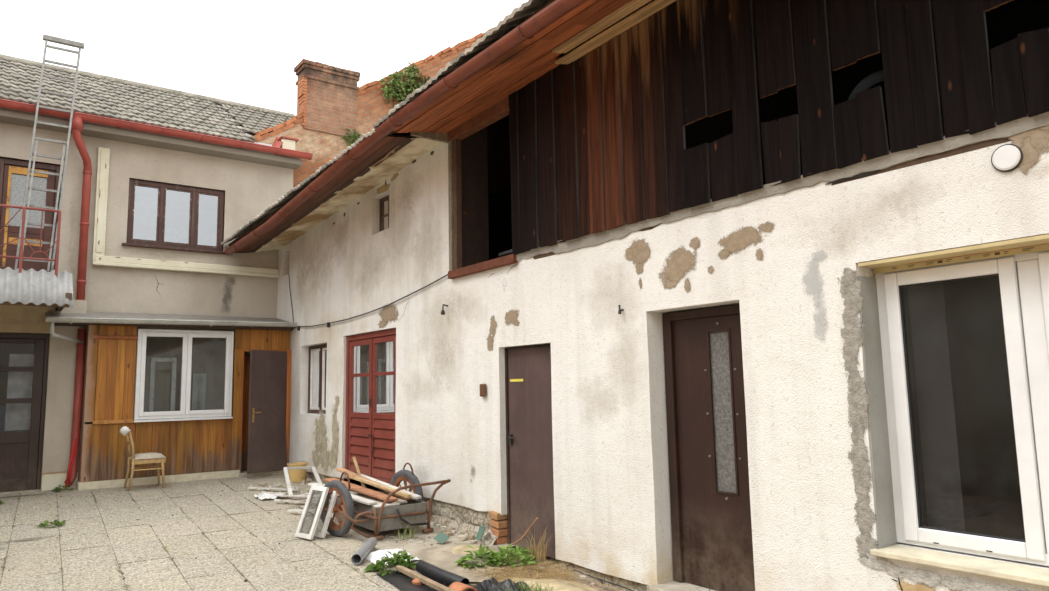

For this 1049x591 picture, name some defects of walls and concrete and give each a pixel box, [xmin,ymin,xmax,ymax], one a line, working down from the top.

flaking render [1008,126,1049,174]
peeling [758,221,774,232]
peeling [625,248,643,288]
peeling [663,278,690,292]
peeling [814,309,826,340]
flaking render [837,267,1028,591]